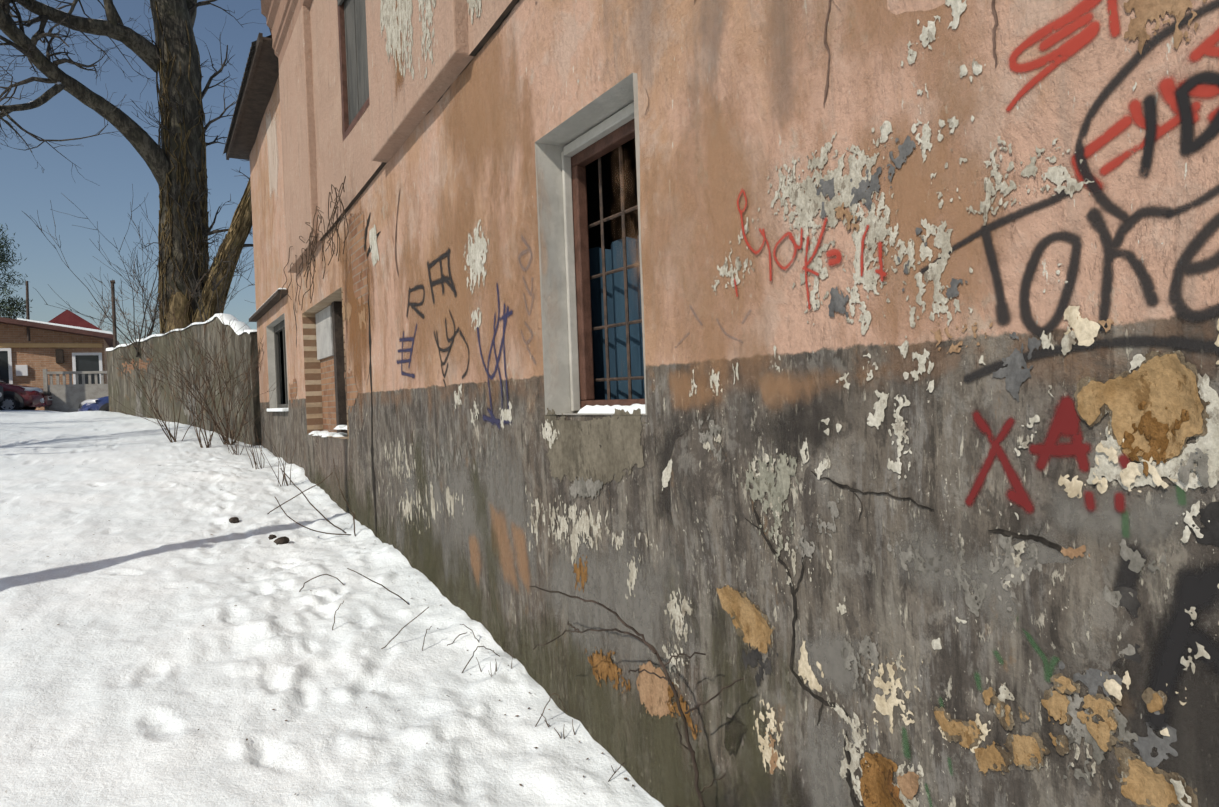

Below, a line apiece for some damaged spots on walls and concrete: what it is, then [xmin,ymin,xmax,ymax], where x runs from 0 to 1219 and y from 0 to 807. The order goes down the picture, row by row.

crack [823,0,841,105]
peeling [712,83,1114,401]
damp [397,437,535,641]
damp [550,534,686,668]
damp [659,431,680,522]
damp [711,708,846,807]
crack [745,504,863,807]
flaking render [798,631,928,807]
crack [811,471,933,518]
crack [988,527,1063,554]
flaking render [934,661,1207,807]
flaking render [1058,319,1219,543]